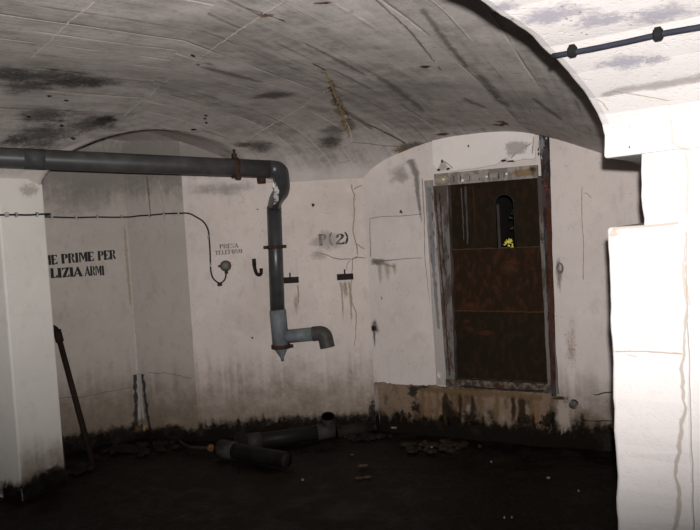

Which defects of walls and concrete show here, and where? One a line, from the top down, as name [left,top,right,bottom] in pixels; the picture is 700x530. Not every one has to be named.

leakage [5,109,65,147]
leakage [0,67,107,94]
leakage [77,116,116,129]
crack [252,64,419,147]
crack [317,180,430,344]
corrosion [419,175,554,429]
leakage [0,317,324,501]
leakage [332,385,616,452]